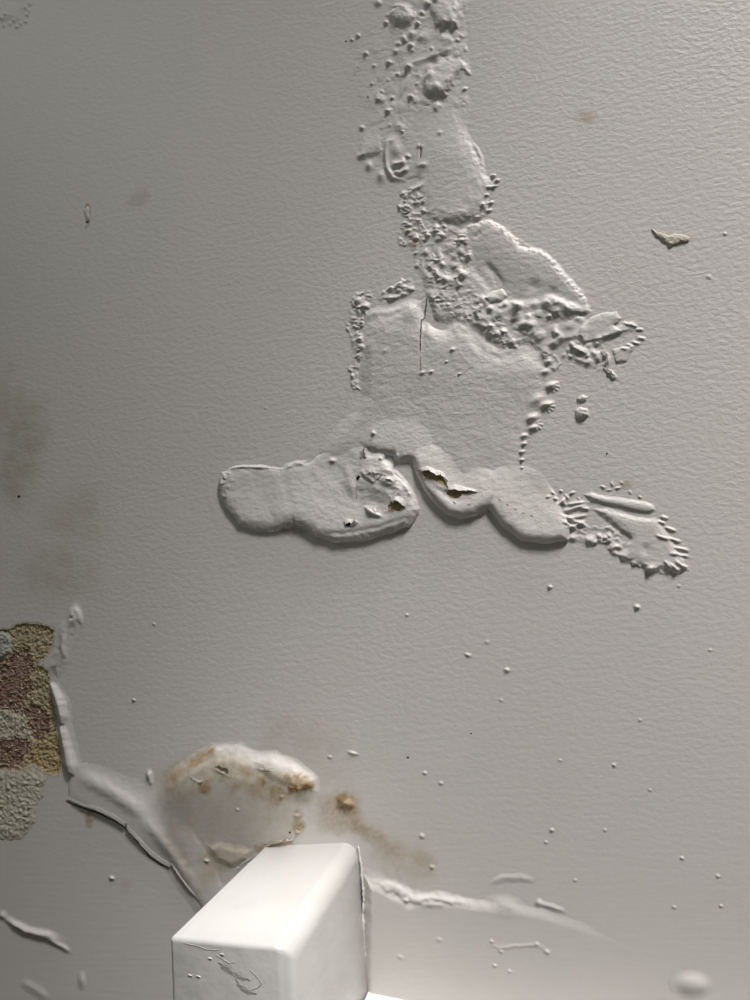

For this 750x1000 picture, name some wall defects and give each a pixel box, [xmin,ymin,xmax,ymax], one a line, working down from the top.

crack [419,297,427,370]
peeling [217,438,572,544]
flaking render [0,621,63,777]